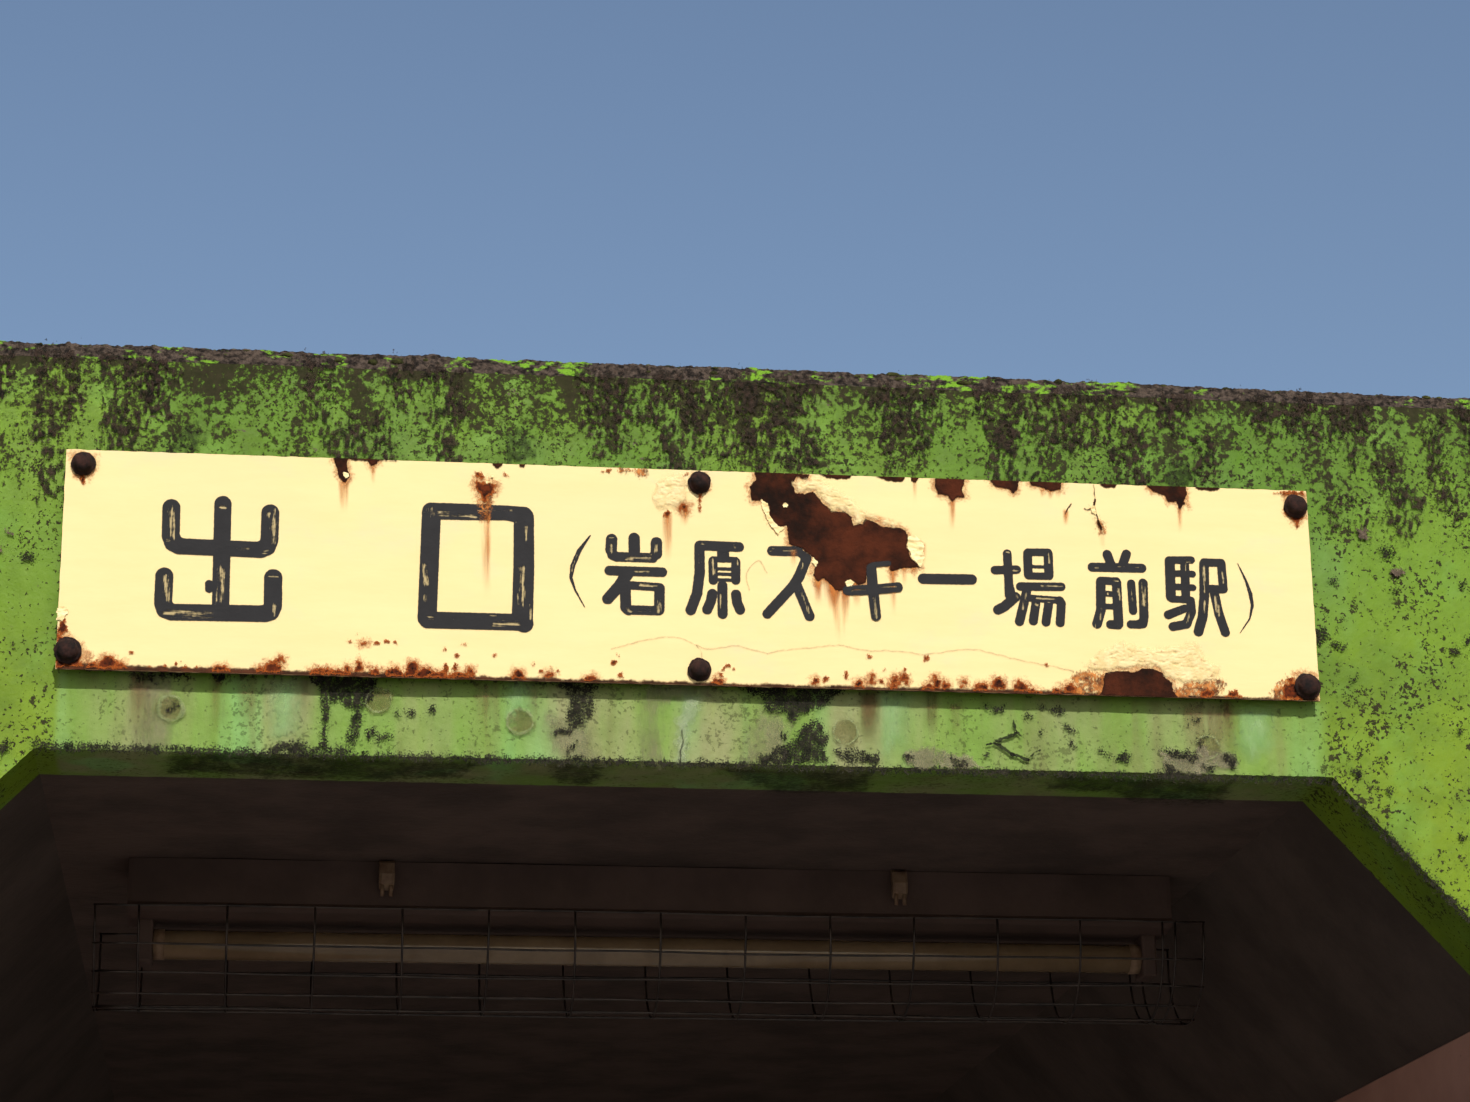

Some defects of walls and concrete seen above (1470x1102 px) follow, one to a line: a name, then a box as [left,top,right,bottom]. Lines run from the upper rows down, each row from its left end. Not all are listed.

water stain [0,338,184,505]
water stain [300,349,474,462]
water stain [572,365,825,474]
water stain [861,374,945,475]
water stain [970,378,1223,487]
crack [986,720,1041,761]
water stain [29,676,1470,925]